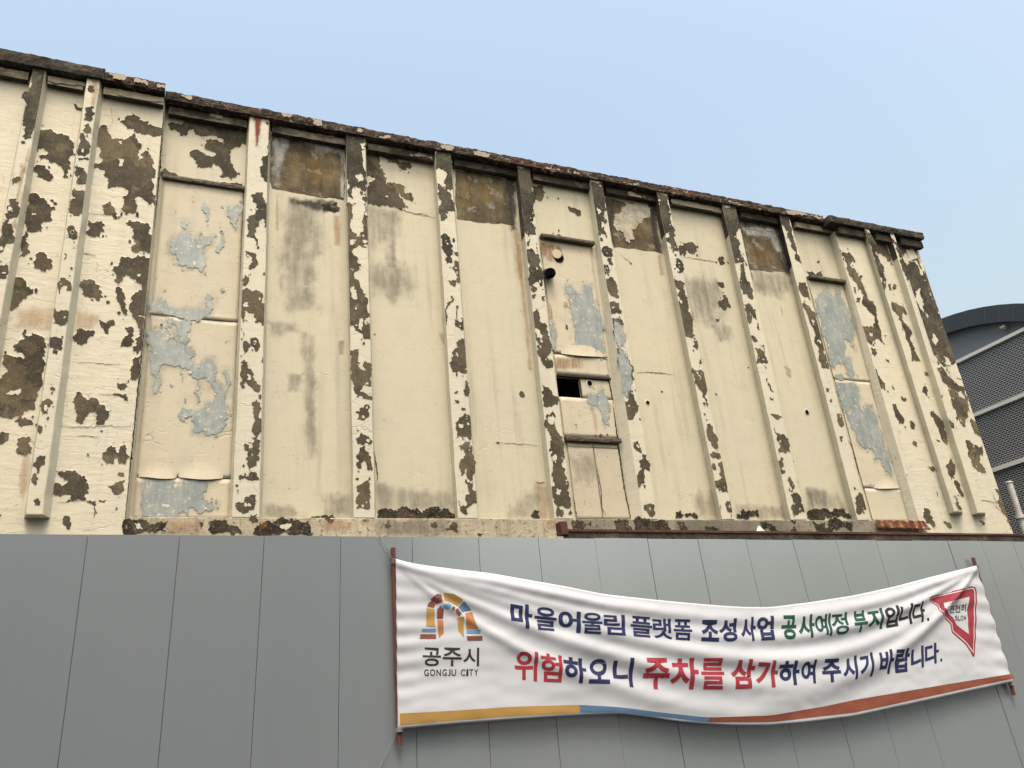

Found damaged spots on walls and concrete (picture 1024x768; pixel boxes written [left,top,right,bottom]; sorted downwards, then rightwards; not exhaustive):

peeling [0,68,272,523]
peeling [346,134,415,509]
damp [455,170,515,225]
peeling [518,167,650,420]
damp [741,229,788,289]
peeling [779,215,917,475]
peeling [865,230,986,510]
rust [875,520,931,530]
peeling [922,507,952,529]